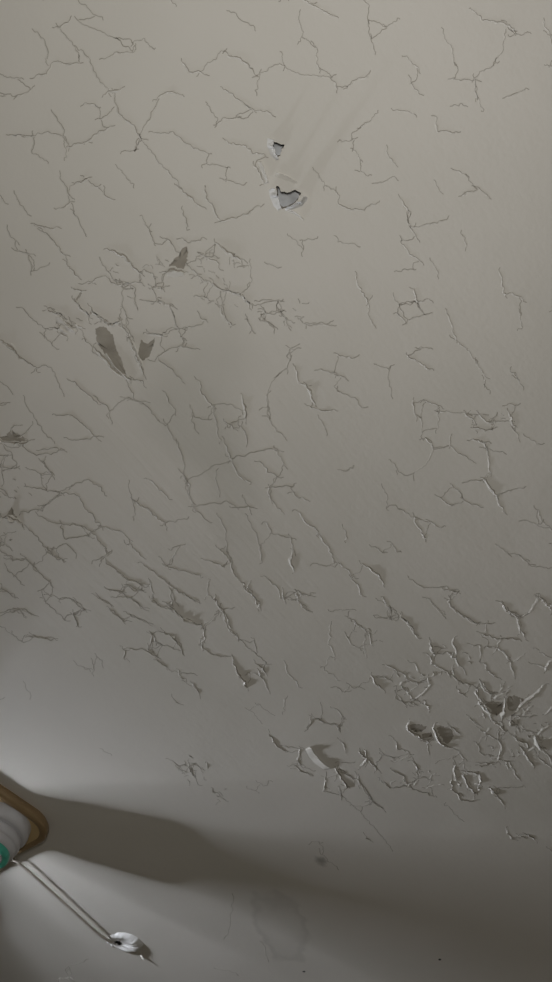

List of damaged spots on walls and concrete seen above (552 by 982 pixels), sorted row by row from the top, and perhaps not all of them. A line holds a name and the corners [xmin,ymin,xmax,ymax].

crack [6,109,93,164]
crack [74,0,276,209]
crack [252,0,339,78]
crack [363,0,400,55]
crack [337,27,529,177]
crack [0,190,82,280]
peeling [16,206,253,447]
crack [392,194,527,394]
crack [0,298,552,724]
peeling [268,729,331,776]
crack [304,702,444,852]
peeling [330,611,552,822]